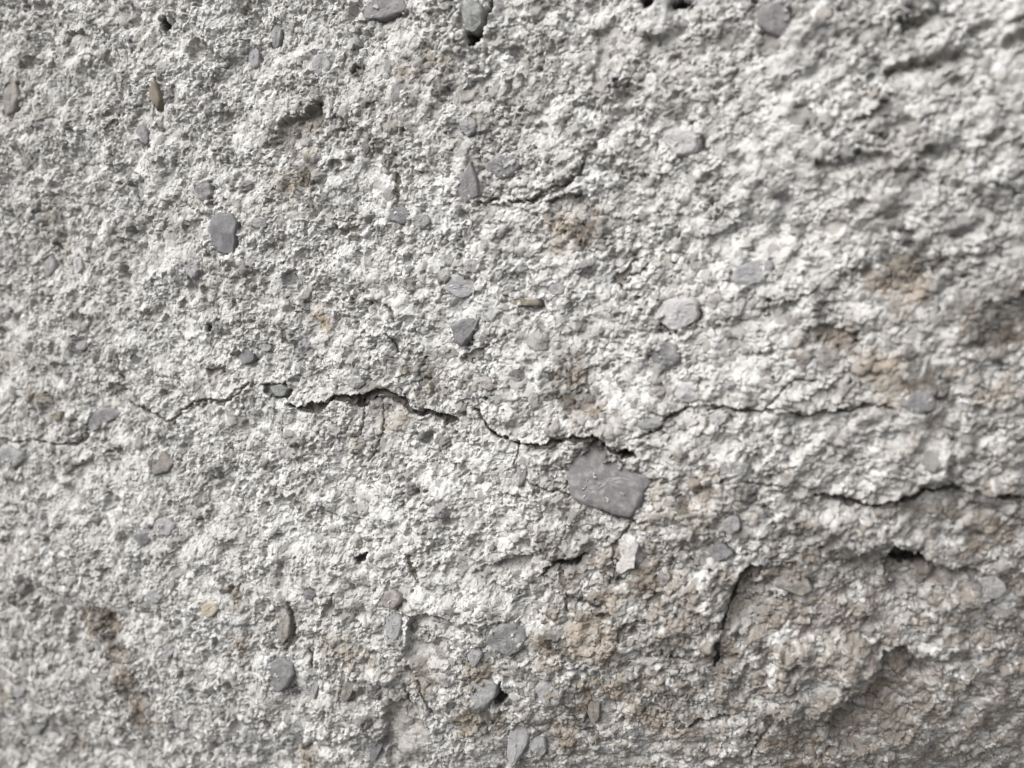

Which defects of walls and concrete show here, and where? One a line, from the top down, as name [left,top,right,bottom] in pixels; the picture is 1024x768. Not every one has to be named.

crack [117,358,249,424]
crack [0,429,124,455]
crack [288,378,892,497]
crack [814,485,961,509]
crack [997,493,1024,501]
crack [713,565,763,667]